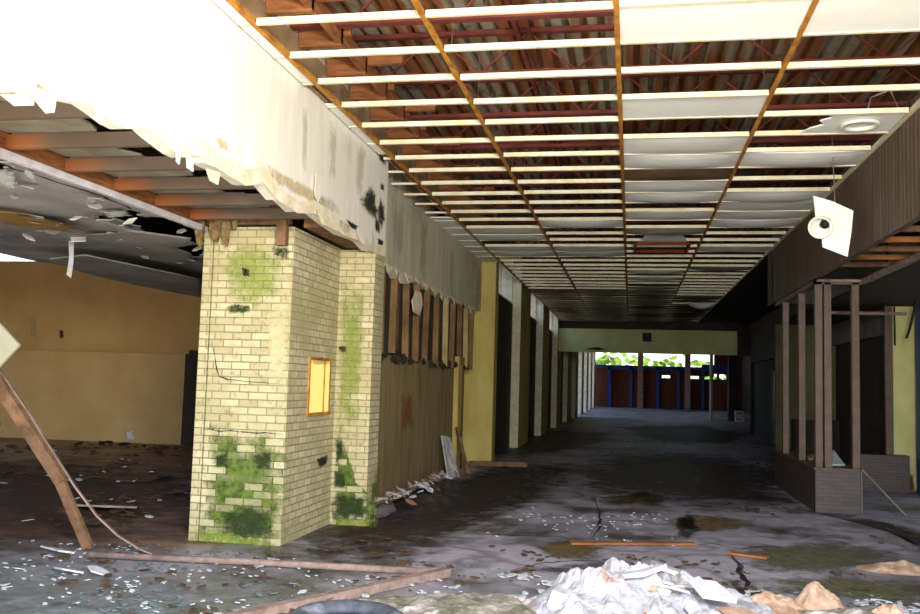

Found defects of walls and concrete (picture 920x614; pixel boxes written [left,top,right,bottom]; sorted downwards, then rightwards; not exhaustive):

spalling [0,41,476,316]
leakage [361,184,385,233]
crack [554,488,602,538]
crack [515,559,606,570]